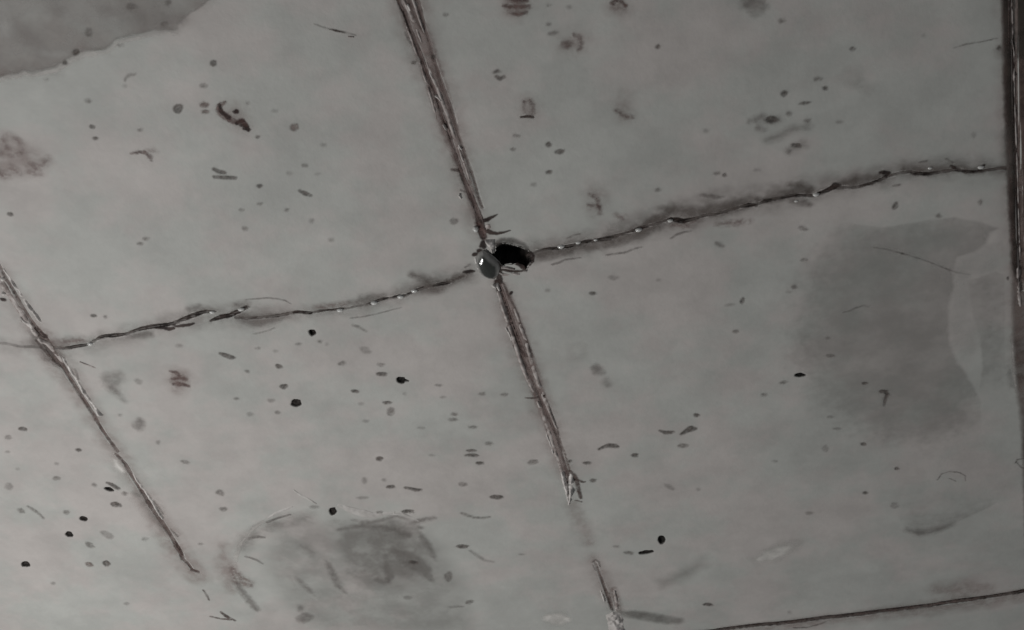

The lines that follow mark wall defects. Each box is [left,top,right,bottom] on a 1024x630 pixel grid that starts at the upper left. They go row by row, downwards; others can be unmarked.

crack [397,0,510,241]
hole [472,239,534,289]
crack [527,0,1024,457]
crack [0,268,584,621]
crack [597,566,618,610]
crack [709,589,1024,630]